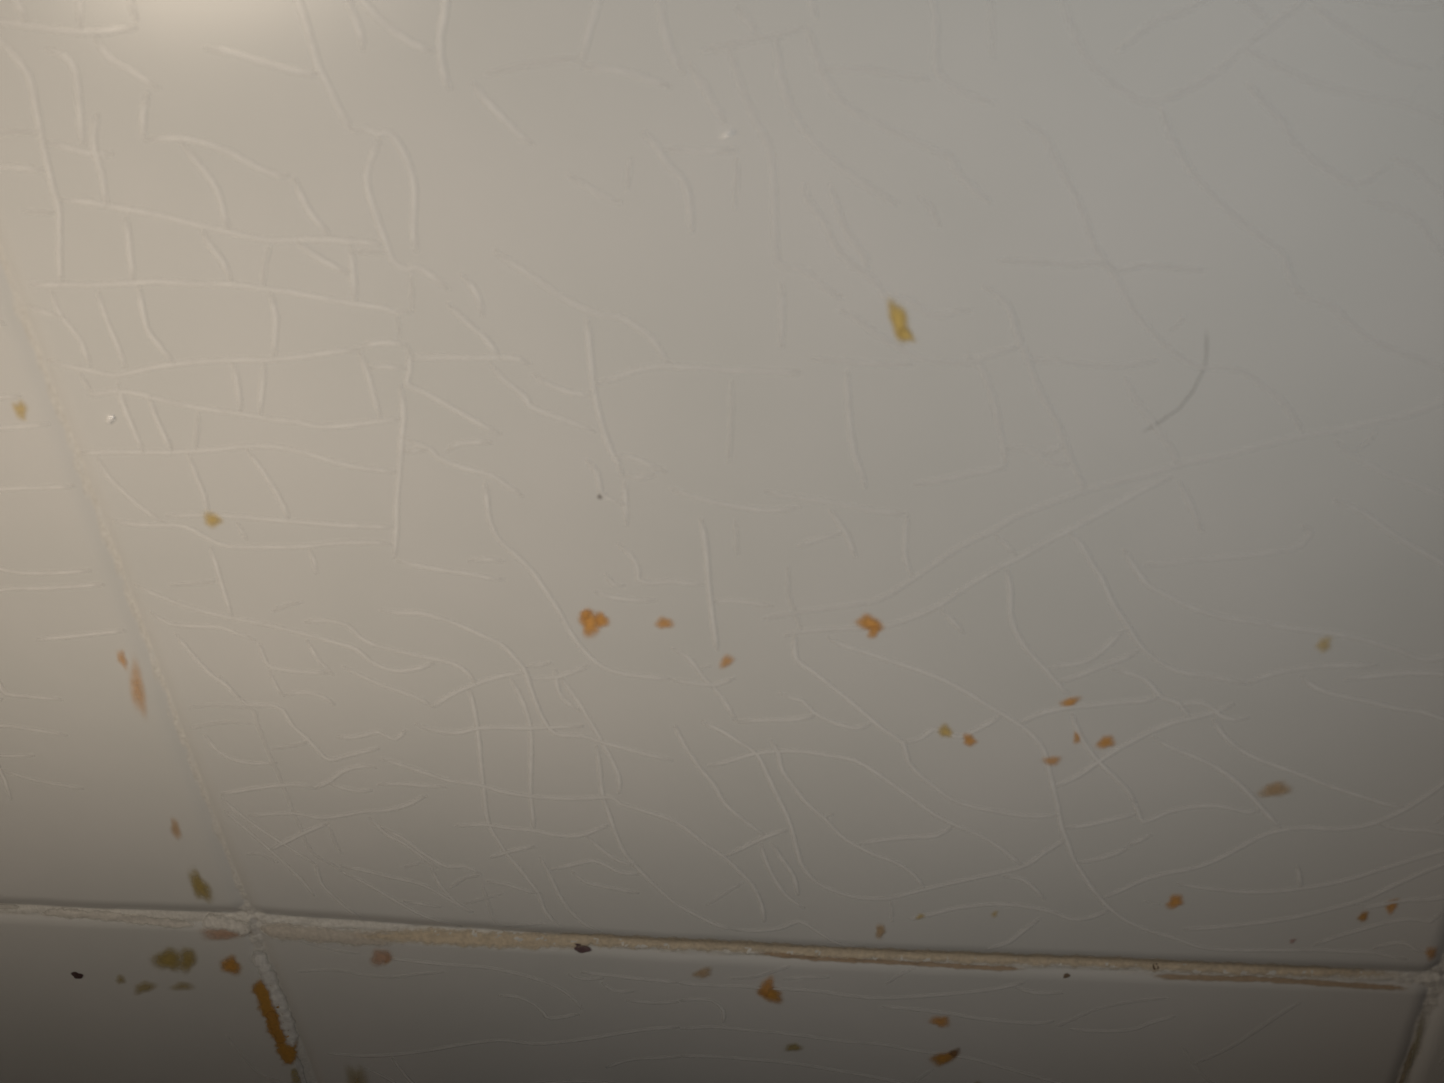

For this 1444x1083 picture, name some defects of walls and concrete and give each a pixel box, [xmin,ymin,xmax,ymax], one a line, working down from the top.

corrosion [581,611,607,634]
corrosion [859,616,880,636]
corrosion [941,727,975,745]
corrosion [156,951,194,969]
corrosion [222,957,239,973]
corrosion [760,980,781,1001]
corrosion [253,981,297,1064]
corrosion [933,1050,958,1065]